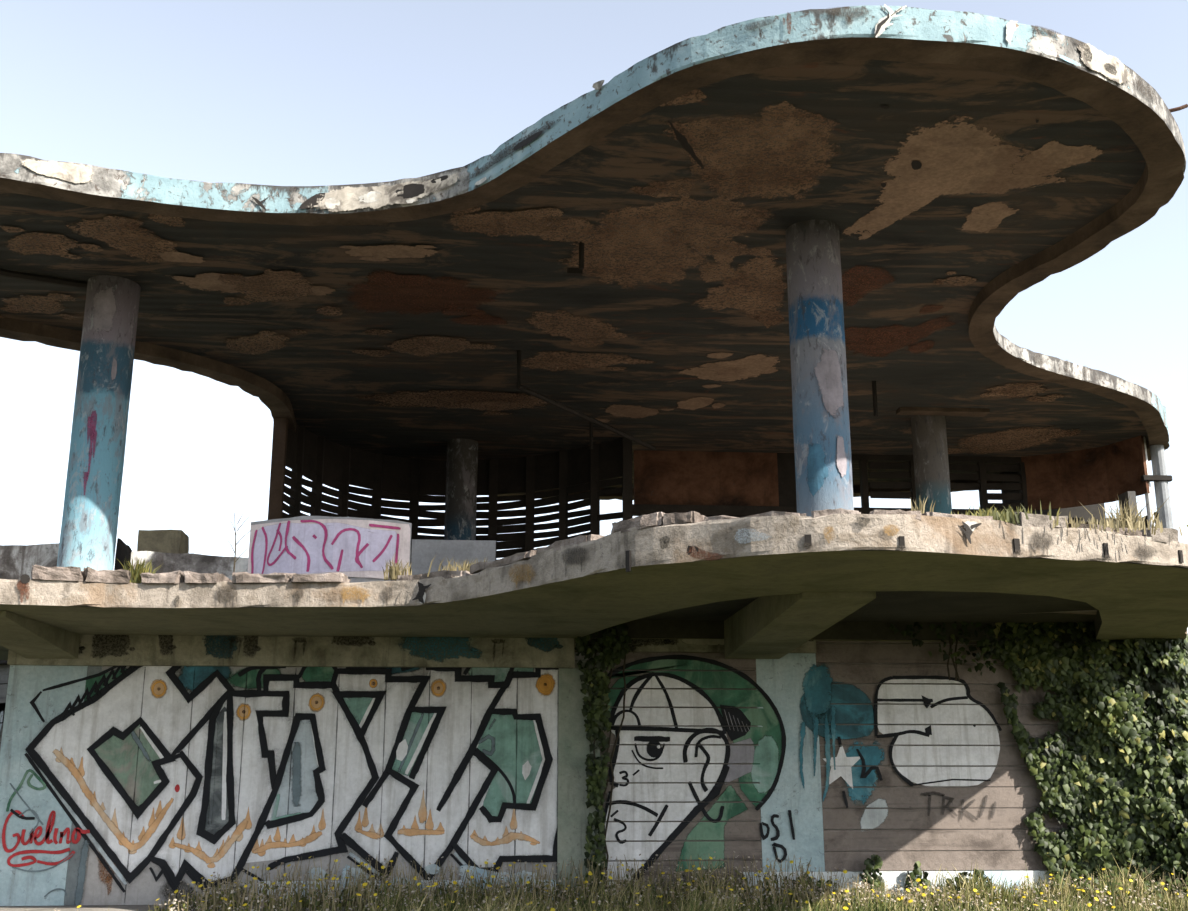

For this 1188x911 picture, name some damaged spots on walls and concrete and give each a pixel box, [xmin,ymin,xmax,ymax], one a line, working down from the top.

peeling [1006,20,1018,44]
peeling [1060,43,1157,102]
spalling [298,121,555,212]
peeling [842,114,1103,240]
peeling [0,214,343,320]
peeling [340,245,439,261]
peeling [93,287,116,332]
peeling [223,329,307,355]
peeling [807,436,847,496]
spalling [686,545,722,561]